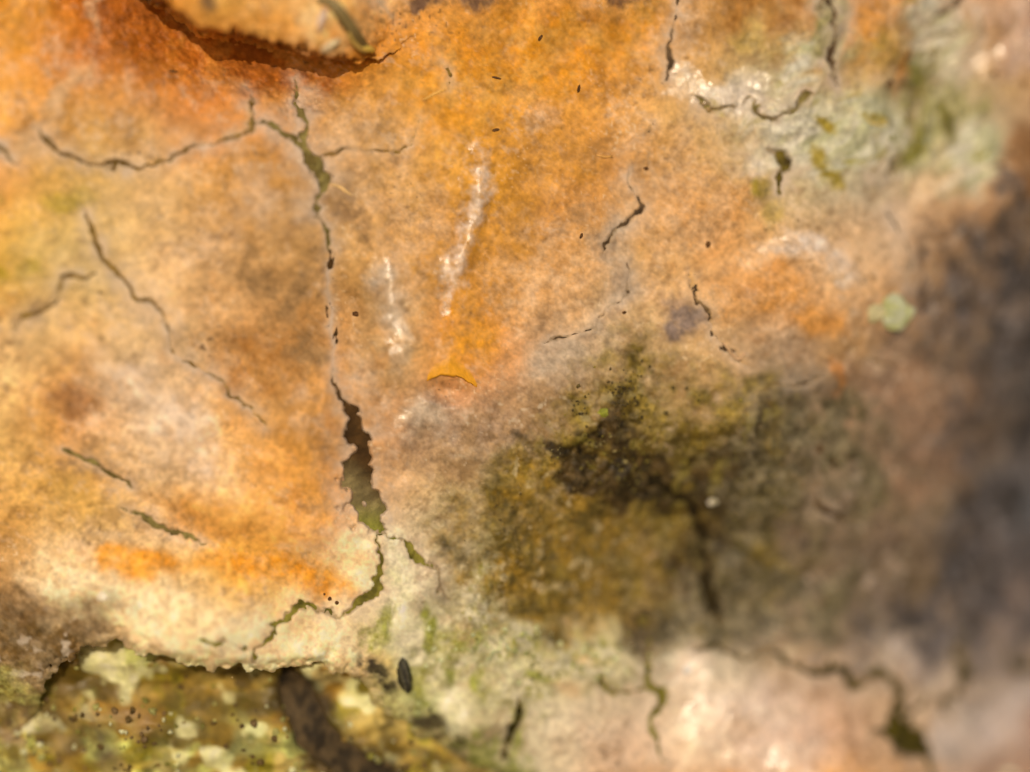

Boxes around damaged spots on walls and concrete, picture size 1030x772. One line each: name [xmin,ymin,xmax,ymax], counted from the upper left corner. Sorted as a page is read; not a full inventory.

crack [665,0,680,81]
crack [819,0,838,86]
crack [926,0,983,63]
crack [40,85,344,250]
crack [696,90,811,121]
crack [14,215,266,425]
leakage [384,0,1030,716]
crack [62,448,207,545]
crack [197,534,439,660]
crack [598,639,668,763]
crack [694,634,972,772]